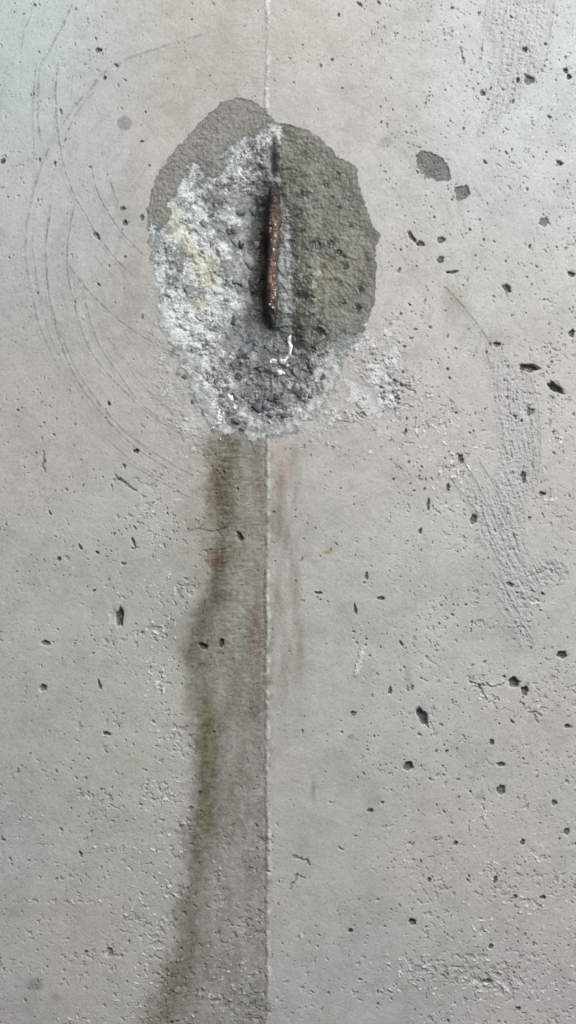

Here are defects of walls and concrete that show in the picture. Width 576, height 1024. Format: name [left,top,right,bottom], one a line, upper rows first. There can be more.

spalling [146,98,421,457]